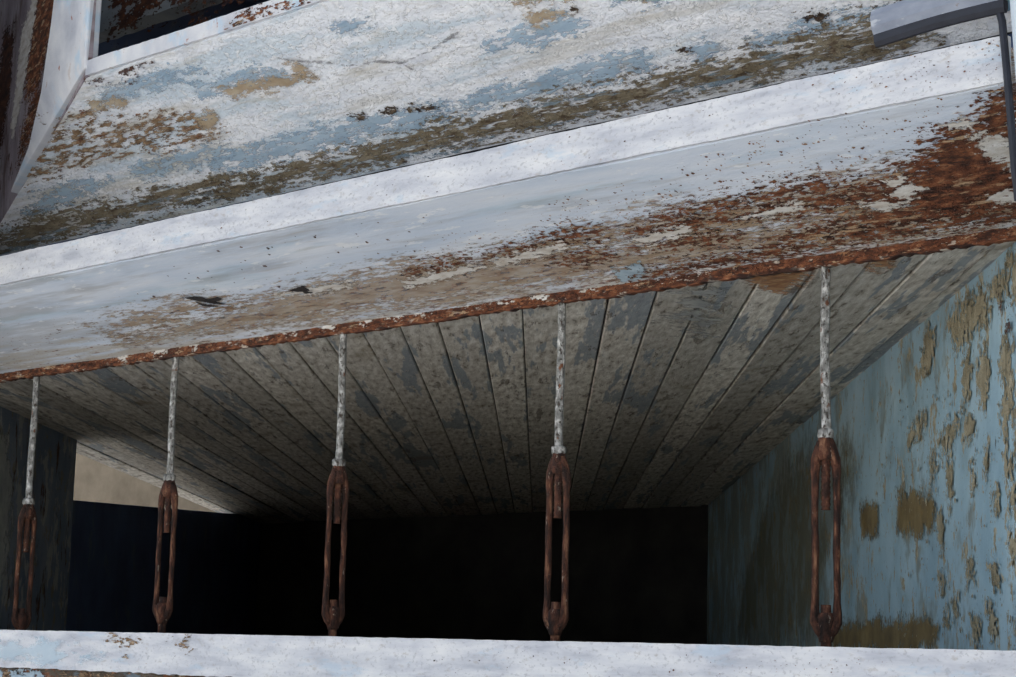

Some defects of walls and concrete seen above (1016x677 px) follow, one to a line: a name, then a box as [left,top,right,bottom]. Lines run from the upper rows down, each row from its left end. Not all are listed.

corrosion [0,21,16,159]
corrosion [15,0,230,193]
peeling [98,61,291,108]
corrosion [105,0,311,46]
peeling [127,0,949,213]
peeling [20,174,115,216]
corrosion [0,42,1016,379]
peeling [870,246,1016,650]
corrosion [56,669,119,677]